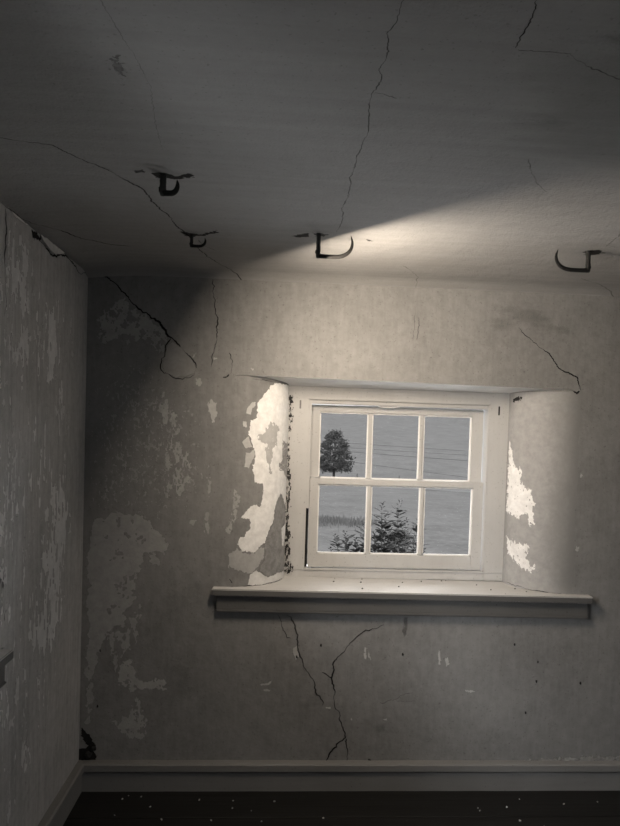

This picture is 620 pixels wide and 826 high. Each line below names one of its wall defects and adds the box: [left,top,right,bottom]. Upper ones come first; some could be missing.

crack [339,0,404,227]
crack [515,0,617,79]
peeling [4,217,42,369]
crack [4,138,242,380]
crack [519,328,581,390]
peeling [28,475,71,666]
peeling [79,511,169,760]
peeling [225,383,289,586]
crack [278,615,382,760]
peeling [502,391,583,594]